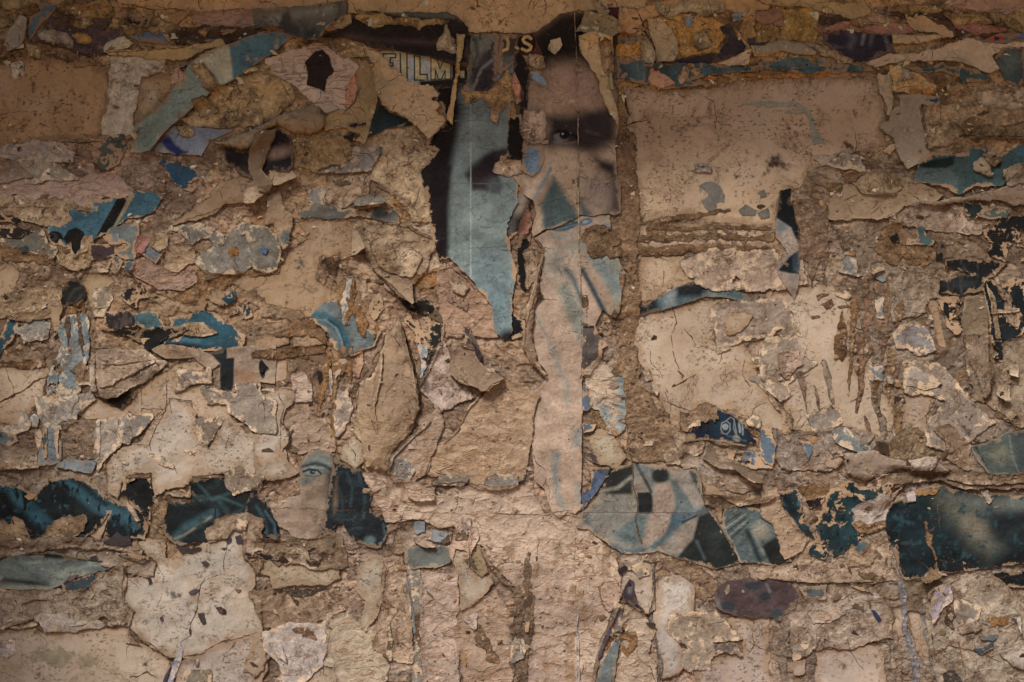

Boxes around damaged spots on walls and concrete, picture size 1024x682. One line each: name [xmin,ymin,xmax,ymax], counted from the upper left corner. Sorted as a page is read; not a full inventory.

peeling [0,0,110,146]
peeling [363,23,465,139]
peeling [172,105,365,319]
peeling [576,0,933,437]
peeling [0,366,50,425]
flaking render [79,335,327,499]
peeling [356,316,423,426]
crack [650,306,696,411]
flaking render [0,530,341,682]
flaking render [451,543,494,610]
peeling [617,560,771,682]
peeling [814,645,886,682]